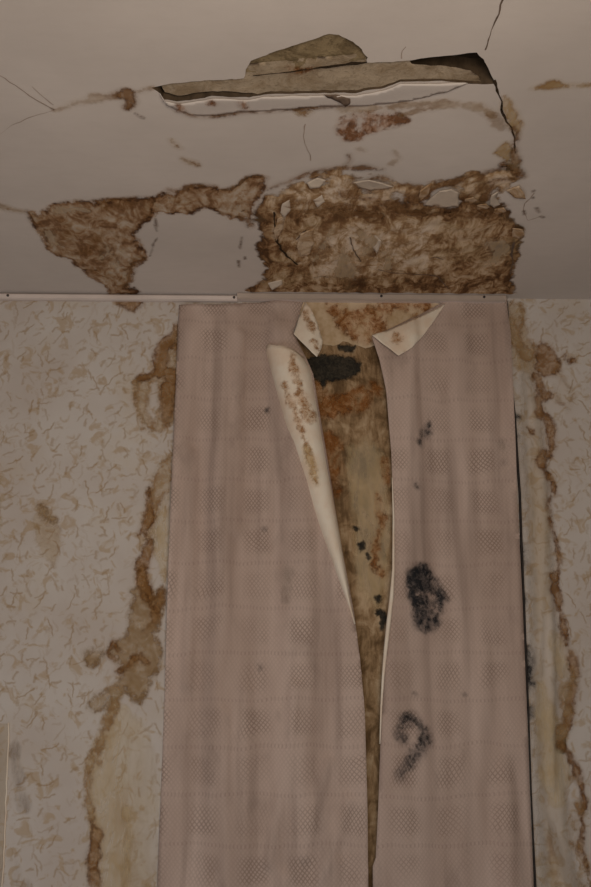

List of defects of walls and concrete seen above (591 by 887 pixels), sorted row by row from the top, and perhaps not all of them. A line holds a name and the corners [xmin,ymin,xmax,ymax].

crack [485,0,503,50]
crack [1,76,54,132]
spalling [157,34,481,118]
crack [494,80,516,153]
damp [535,80,567,89]
flaking render [245,155,526,294]
damp [132,325,178,431]
damp [307,345,361,387]
damp [510,302,576,503]
damp [407,563,448,631]
damp [84,455,173,887]
damp [548,516,591,887]